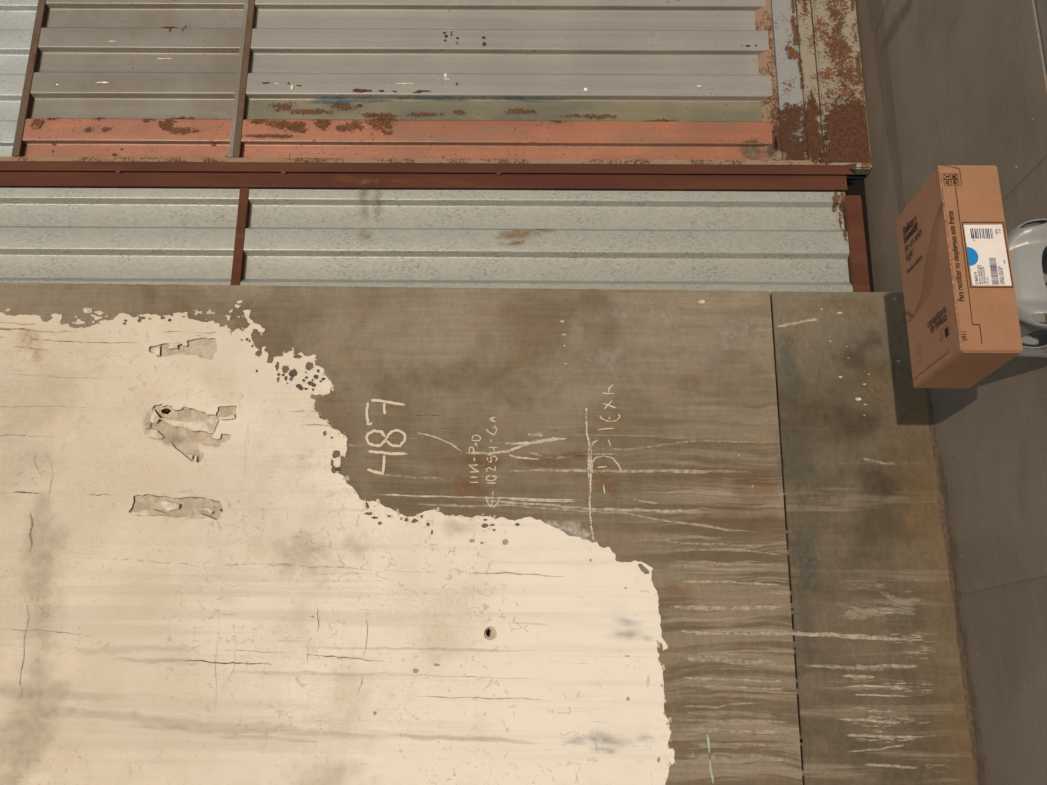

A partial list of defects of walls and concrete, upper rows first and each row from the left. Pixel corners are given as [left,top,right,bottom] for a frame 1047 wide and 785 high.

corrosion [767,0,871,163]
corrosion [241,95,466,138]
corrosion [549,113,616,123]
spalling [150,338,217,360]
peeling [123,300,263,351]
spalling [143,405,237,462]
spalling [275,347,462,535]
spalling [128,495,224,520]
leakage [810,664,915,697]
leakage [841,718,921,768]